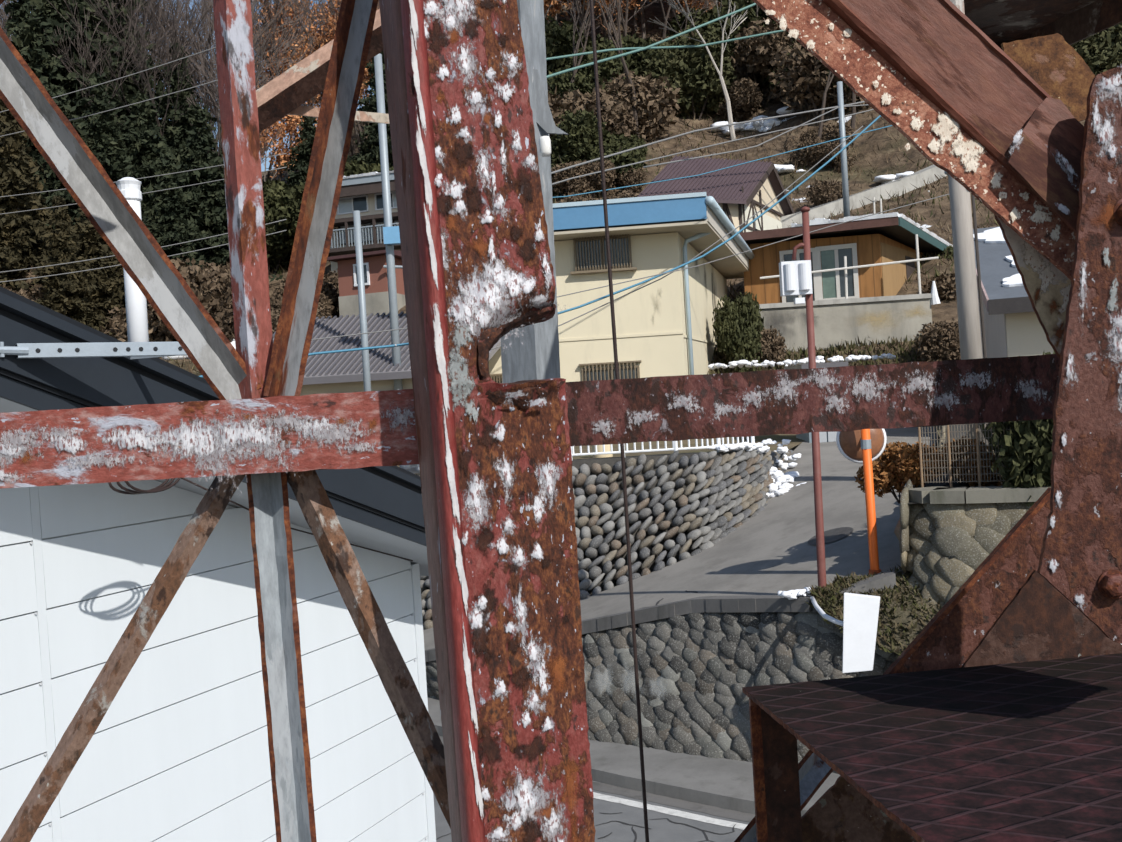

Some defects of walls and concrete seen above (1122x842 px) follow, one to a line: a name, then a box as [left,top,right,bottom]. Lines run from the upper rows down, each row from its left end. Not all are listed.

corrosion [427,0,502,55]
peeling [1091,74,1122,159]
corrosion [437,187,483,230]
peeling [1099,247,1122,413]
peeling [0,409,376,493]
peeling [381,405,415,431]
corrosion [460,418,498,475]
peeling [409,0,569,842]
corrosion [474,526,494,556]
corrosion [471,584,499,666]
corrosion [478,726,546,765]
corrosion [523,761,581,842]